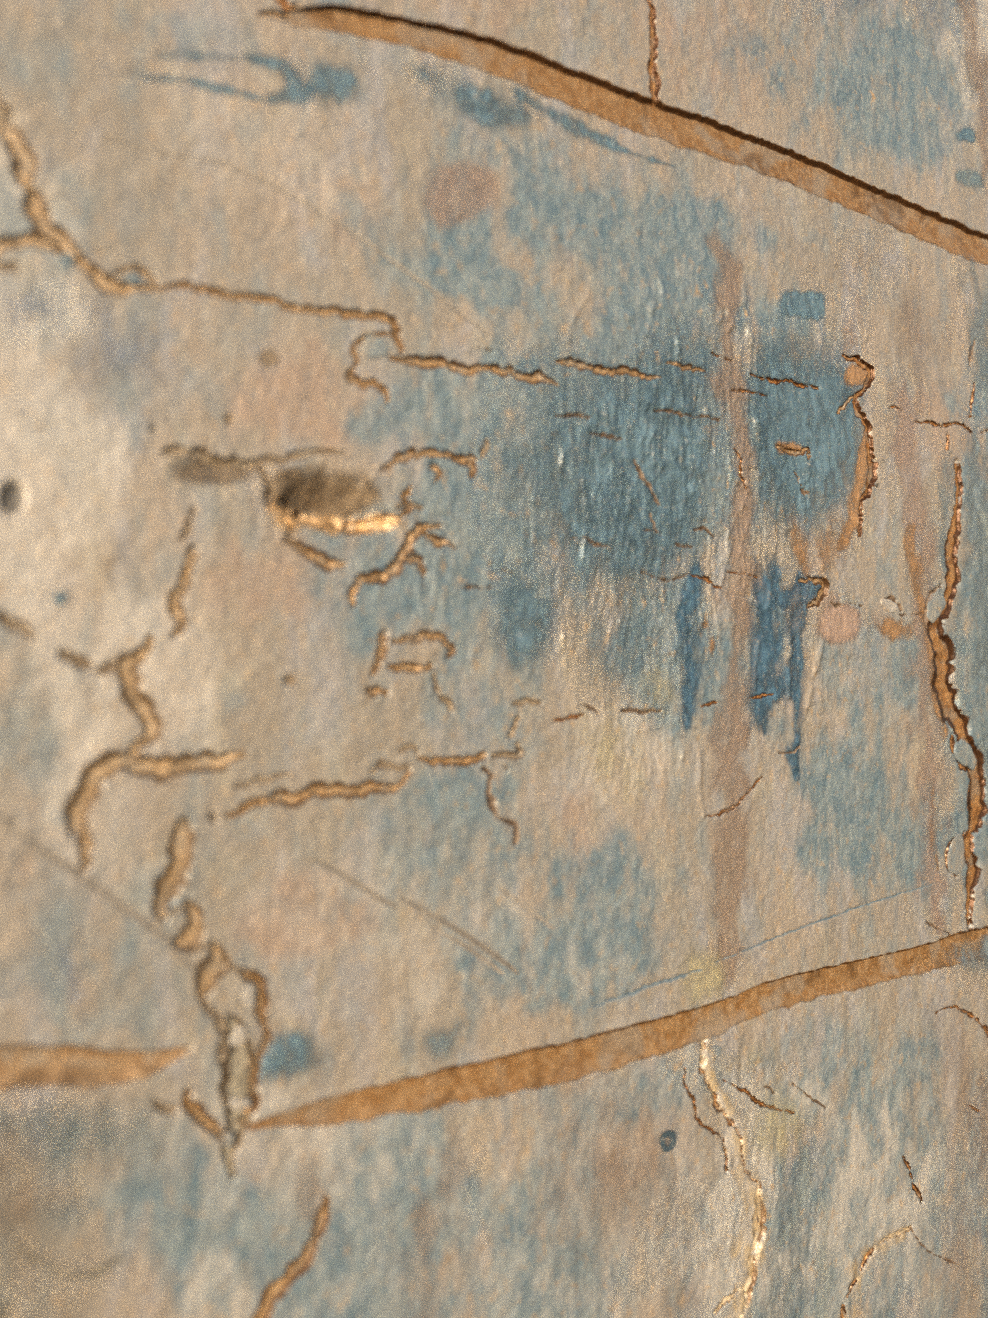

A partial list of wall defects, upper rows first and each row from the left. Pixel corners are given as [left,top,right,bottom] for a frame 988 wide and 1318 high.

crack [258,0,296,21]
crack [646,0,662,108]
crack [0,93,988,935]
crack [60,507,662,1180]
crack [935,1005,988,1037]
crack [683,1039,826,1318]
crack [252,1196,330,1318]